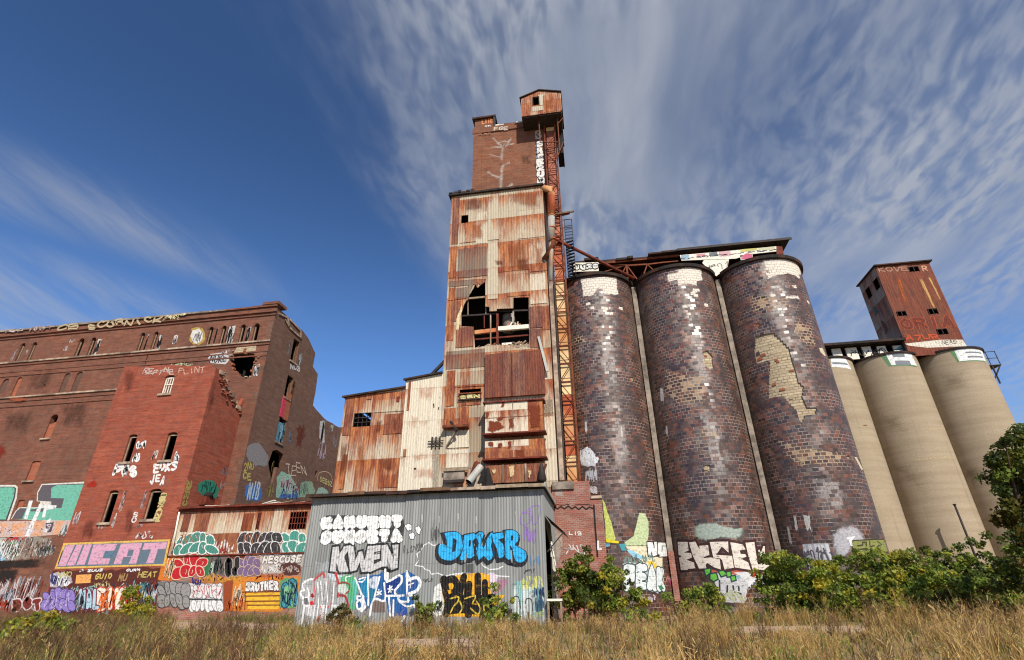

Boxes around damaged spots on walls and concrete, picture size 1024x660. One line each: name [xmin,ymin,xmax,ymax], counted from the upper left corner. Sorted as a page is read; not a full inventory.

rust [497,247,543,269]
spalling [218,345,260,415]
spalling [700,351,713,369]
spalling [755,323,816,424]